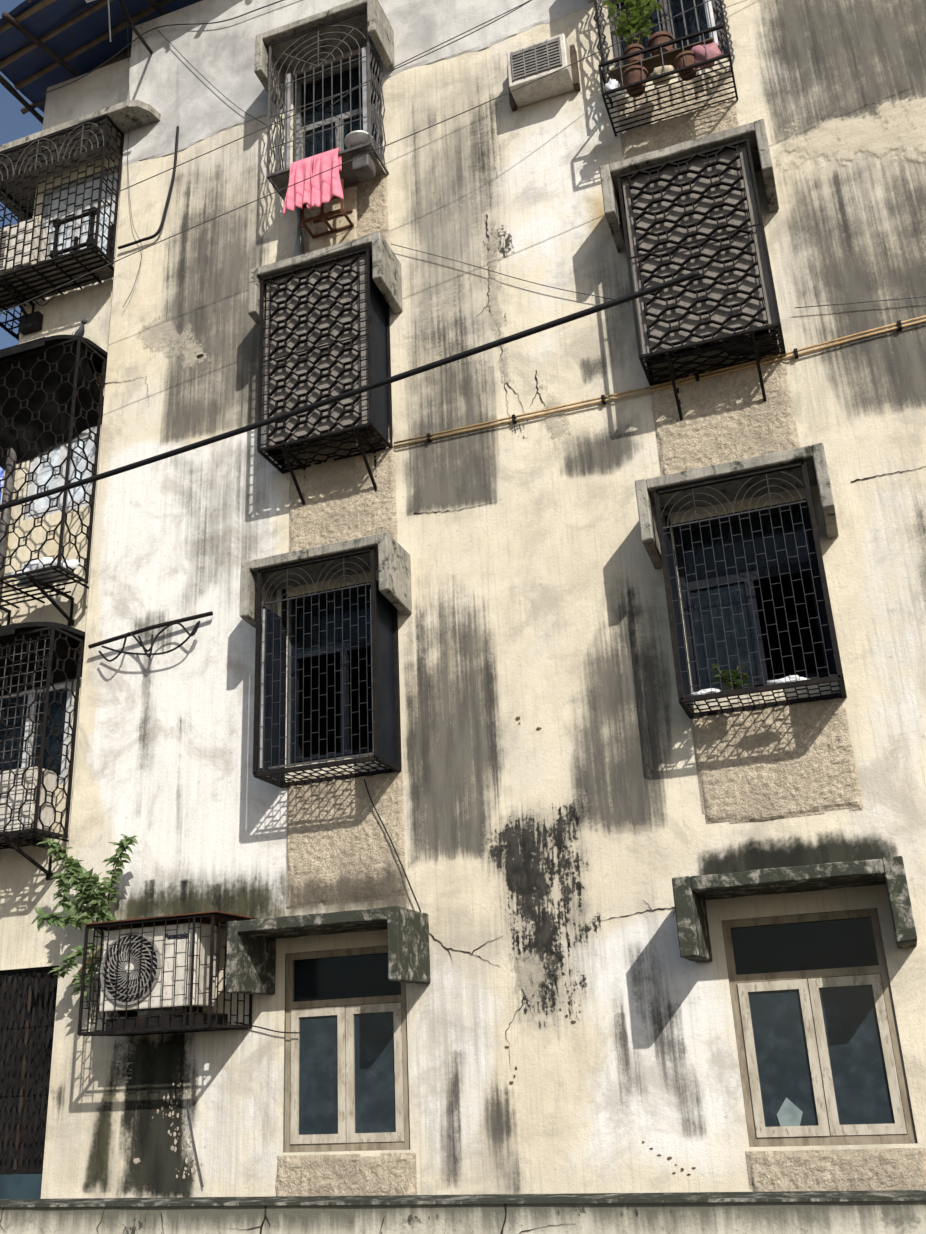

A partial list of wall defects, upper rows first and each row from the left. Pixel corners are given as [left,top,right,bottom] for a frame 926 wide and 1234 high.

damp [765,0,926,138]
damp [163,171,265,442]
damp [483,226,514,258]
crack [477,214,549,417]
damp [794,168,926,411]
damp [407,316,528,515]
damp [406,596,671,1028]
crack [594,900,675,922]
crack [429,933,534,1067]
damp [121,1033,206,1198]
crack [229,1201,270,1234]
crack [500,1204,562,1234]